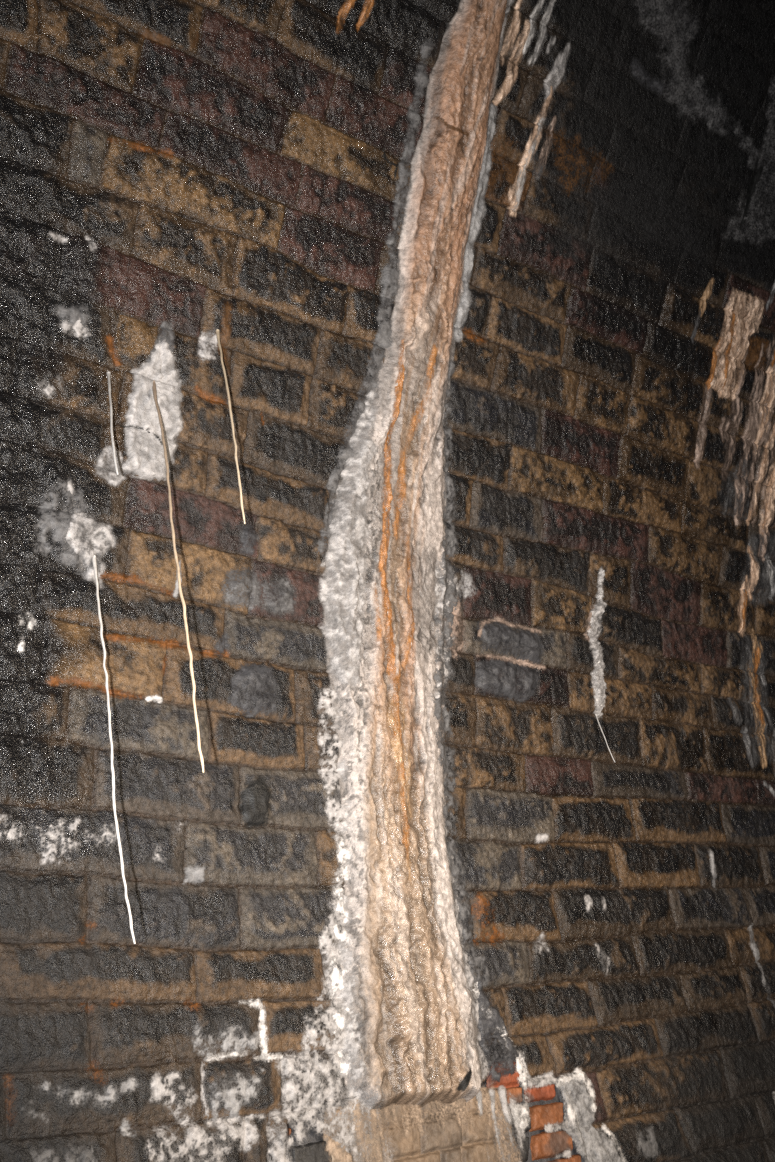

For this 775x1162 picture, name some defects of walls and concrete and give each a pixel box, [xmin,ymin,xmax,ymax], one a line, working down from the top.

damp [337,0,374,31]
damp [508,86,556,217]
damp [66,481,81,523]
damp [442,572,474,658]
damp [584,568,607,718]
damp [30,1144,97,1162]
damp [41,999,392,1162]
spalling [285,1059,586,1162]